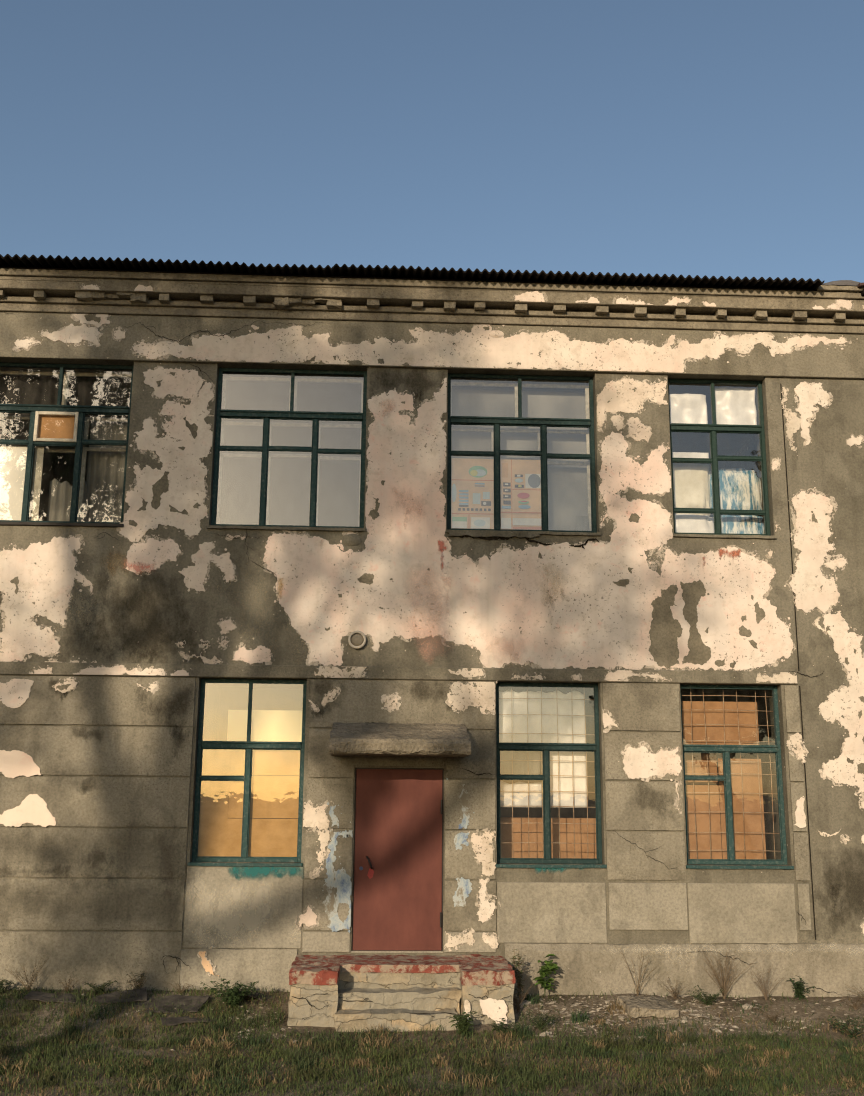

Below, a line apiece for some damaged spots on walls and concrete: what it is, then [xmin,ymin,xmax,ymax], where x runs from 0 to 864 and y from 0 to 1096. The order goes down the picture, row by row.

peeling [0,283,864,814]
peeling [0,794,56,827]
peeling [794,796,806,828]
peeling [818,829,864,844]
peeling [294,799,353,933]